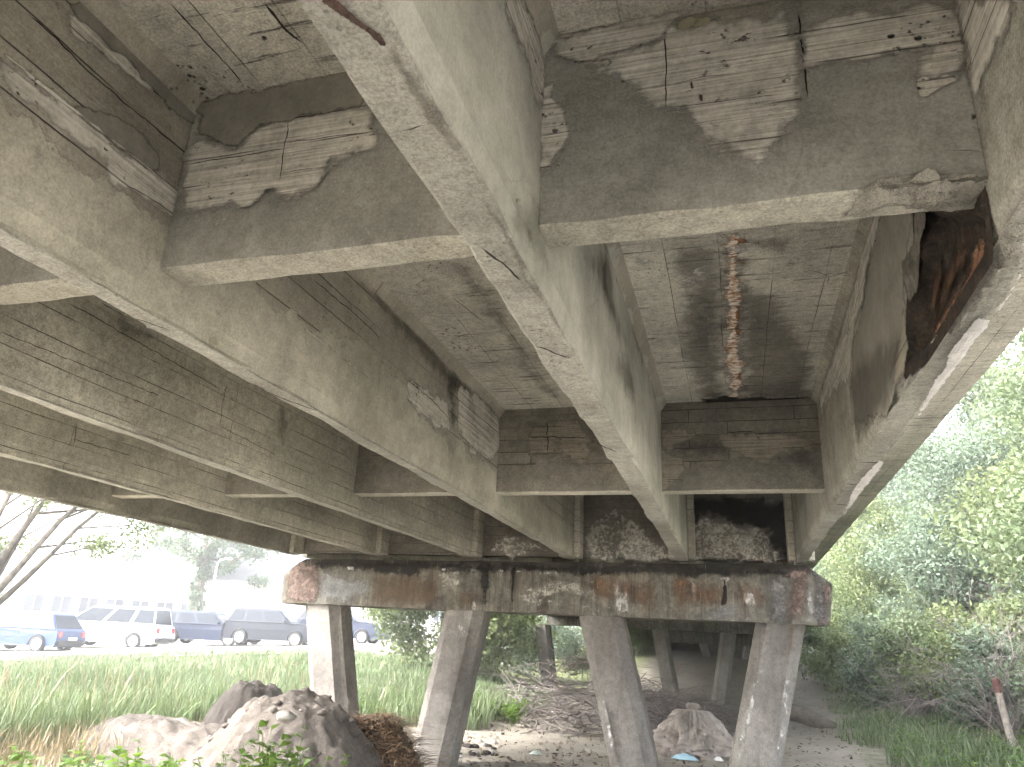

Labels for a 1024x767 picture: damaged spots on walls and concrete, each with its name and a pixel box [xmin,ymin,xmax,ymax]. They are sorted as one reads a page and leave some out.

peeling [0,46,388,218]
crack [171,4,242,83]
peeling [496,0,1018,176]
rust [708,234,766,397]
spalling [818,167,988,414]
rust [931,240,985,335]
spalling [915,220,1024,421]
spalling [844,460,884,514]
water stain [315,494,787,618]
rust [590,577,653,612]
rust [741,584,762,605]